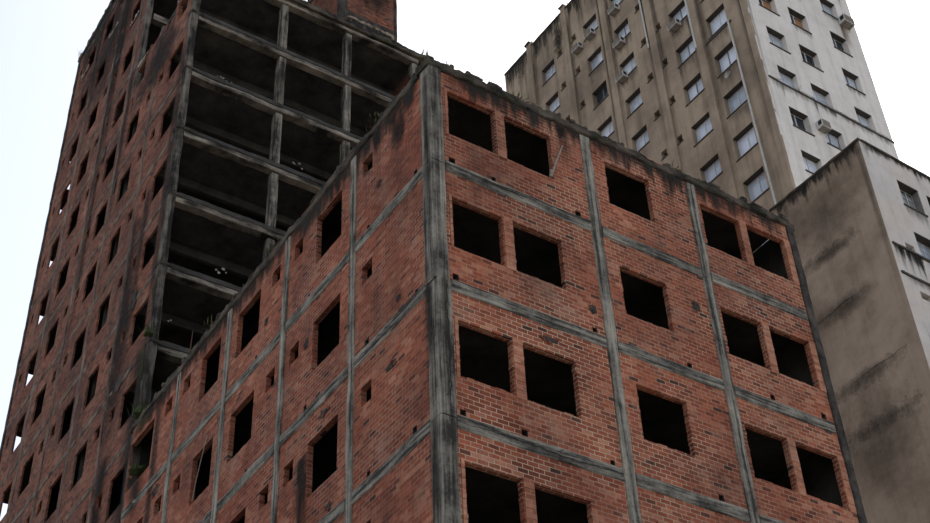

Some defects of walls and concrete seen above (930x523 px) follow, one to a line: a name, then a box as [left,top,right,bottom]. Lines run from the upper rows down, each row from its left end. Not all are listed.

water stain [894,244,925,272]